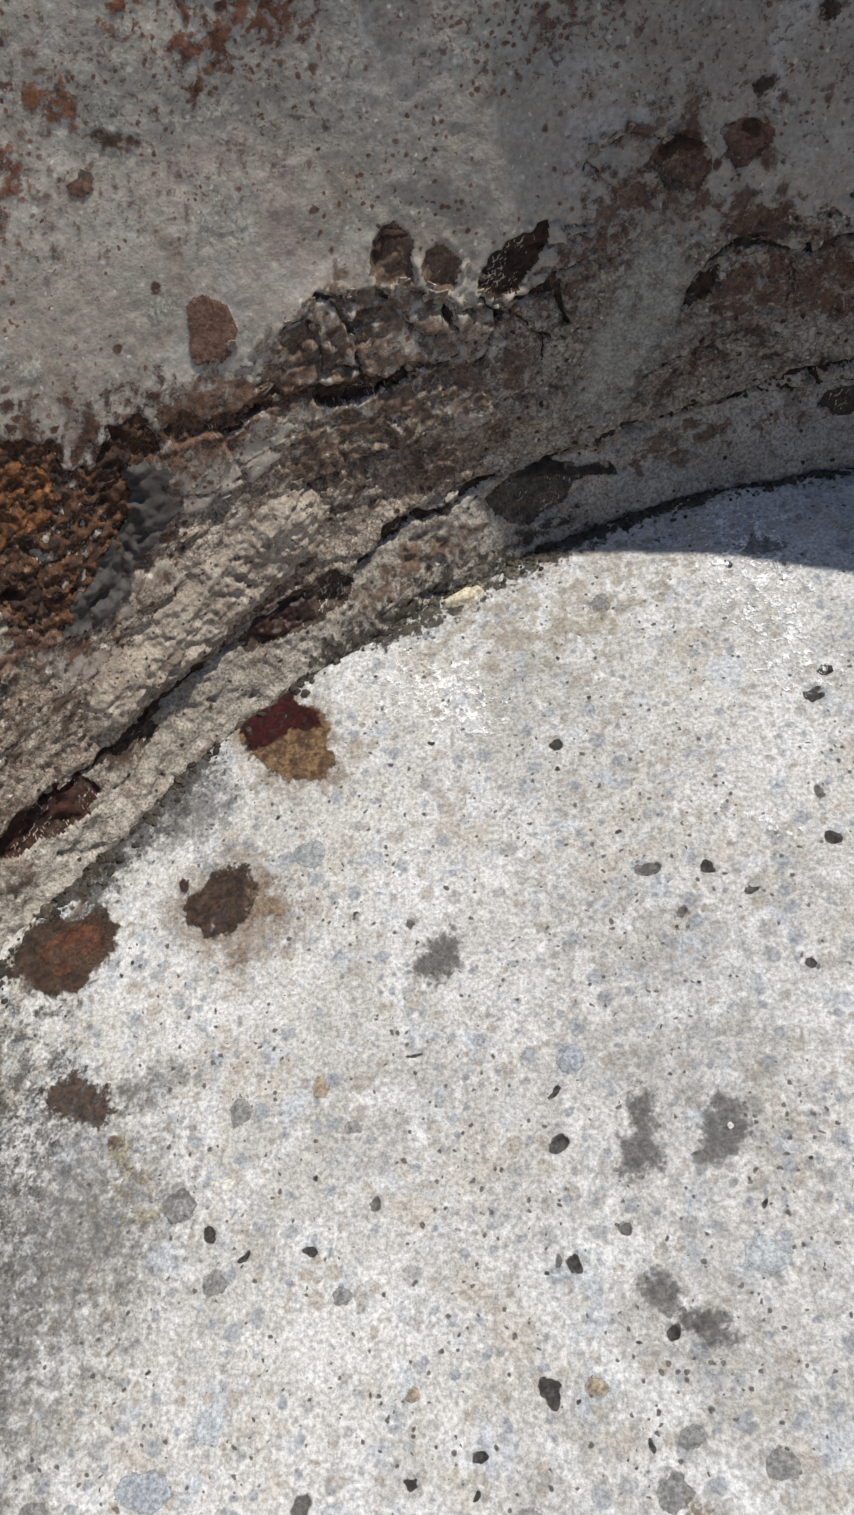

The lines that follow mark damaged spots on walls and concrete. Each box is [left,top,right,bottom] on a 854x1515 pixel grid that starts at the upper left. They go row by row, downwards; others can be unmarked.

spalling [368,220,550,300]
crack [224,252,605,433]
spalling [0,382,282,643]
crack [306,429,433,487]
leakage [6,681,91,774]
corrosion [234,692,353,791]
crack [0,468,853,1009]
spalling [0,771,101,859]
leakage [45,752,240,921]
corrosion [5,897,121,1008]
corrosion [164,849,297,968]
leakage [0,978,188,1448]